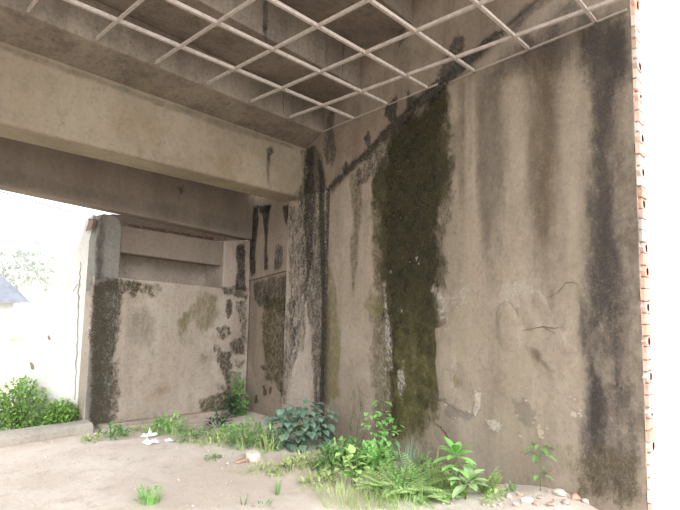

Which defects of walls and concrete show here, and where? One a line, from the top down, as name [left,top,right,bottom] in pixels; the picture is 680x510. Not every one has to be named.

mould [89,279,158,425]
water stain [213,31,503,440]
water stain [588,26,623,353]